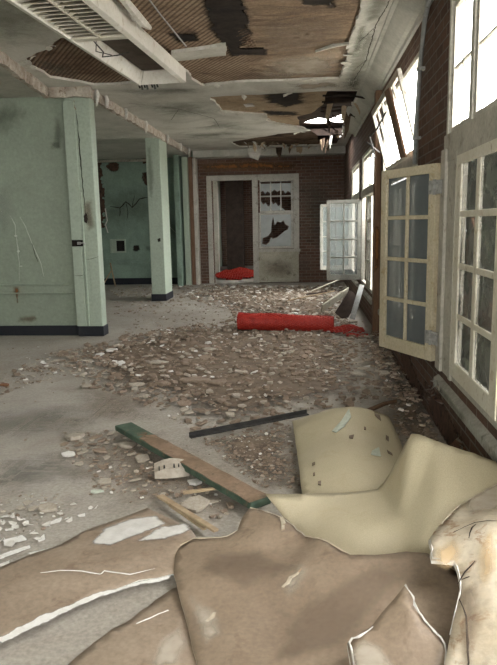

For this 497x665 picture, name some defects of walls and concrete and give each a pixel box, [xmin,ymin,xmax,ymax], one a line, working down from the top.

spalling [19,38,130,86]
spalling [102,39,164,70]
spalling [117,0,360,88]
crack [354,0,390,80]
spalling [211,91,330,154]
crack [74,105,96,304]
spalling [98,162,119,233]